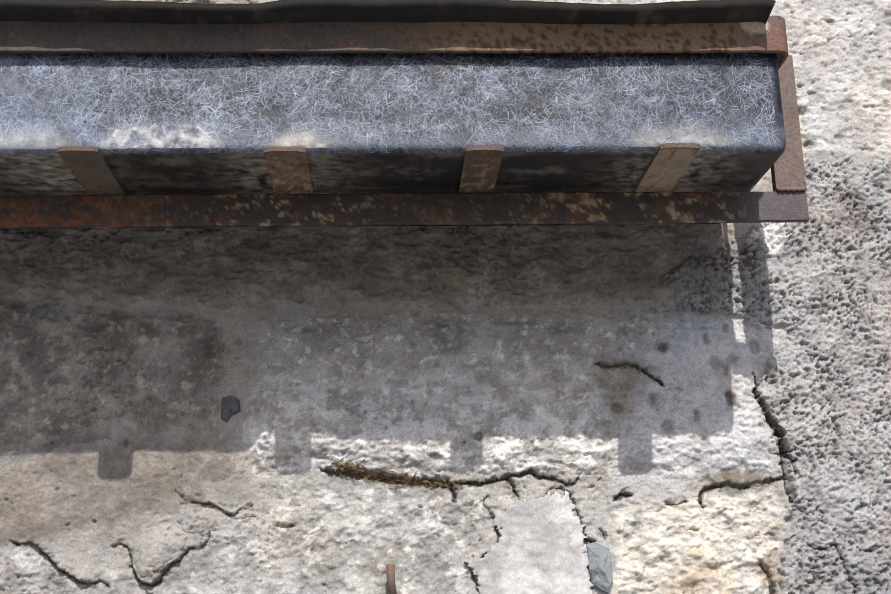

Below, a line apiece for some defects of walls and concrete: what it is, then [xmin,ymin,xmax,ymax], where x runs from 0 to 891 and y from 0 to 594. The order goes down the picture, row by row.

crack [595,363,663,386]
crack [667,373,808,515]
crack [182,497,256,519]
crack [321,468,605,544]
crack [614,492,632,501]
crack [15,543,110,588]
crack [112,534,211,594]
crack [760,566,776,594]